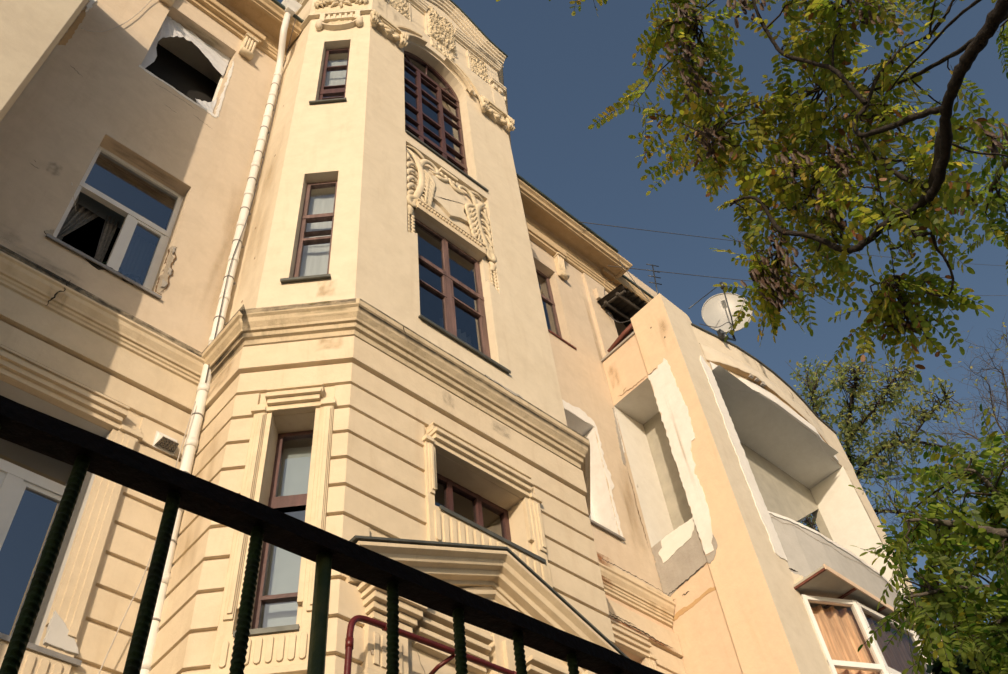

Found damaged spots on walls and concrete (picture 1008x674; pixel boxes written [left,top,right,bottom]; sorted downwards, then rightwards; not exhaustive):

crack [43,268,71,306]
spalling [155,246,177,295]
spalling [651,525,718,597]